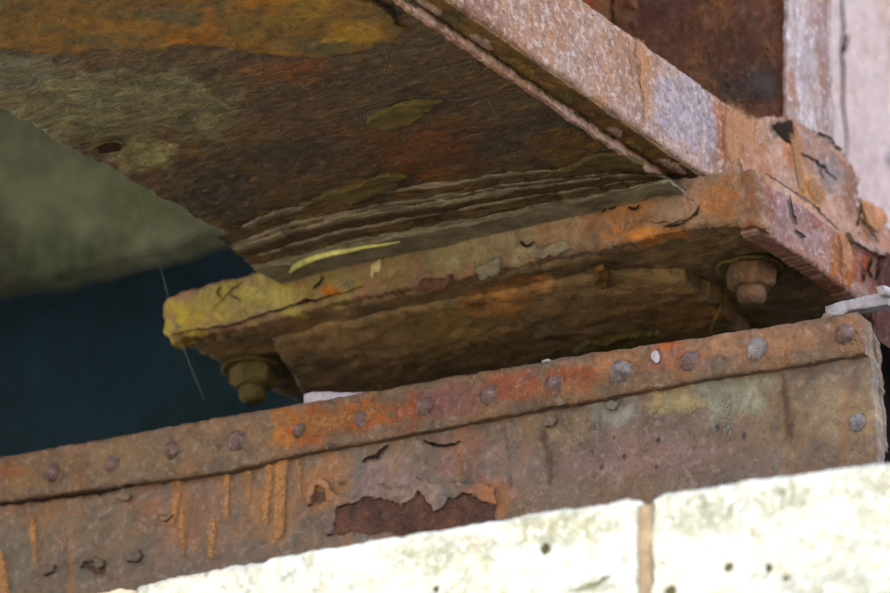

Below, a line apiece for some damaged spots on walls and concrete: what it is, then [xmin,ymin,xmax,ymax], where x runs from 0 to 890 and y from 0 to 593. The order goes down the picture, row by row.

corrosion [415,0,512,67]
crack [801,0,849,179]
corrosion [724,106,825,202]
corrosion [217,152,698,284]
crack [765,173,880,282]
corrosion [840,232,886,274]
corrosion [859,198,888,231]
corrosion [574,330,667,356]
corrosion [710,291,737,335]
corrosion [207,474,230,558]
corrosion [261,458,499,539]
corrosion [0,552,9,593]